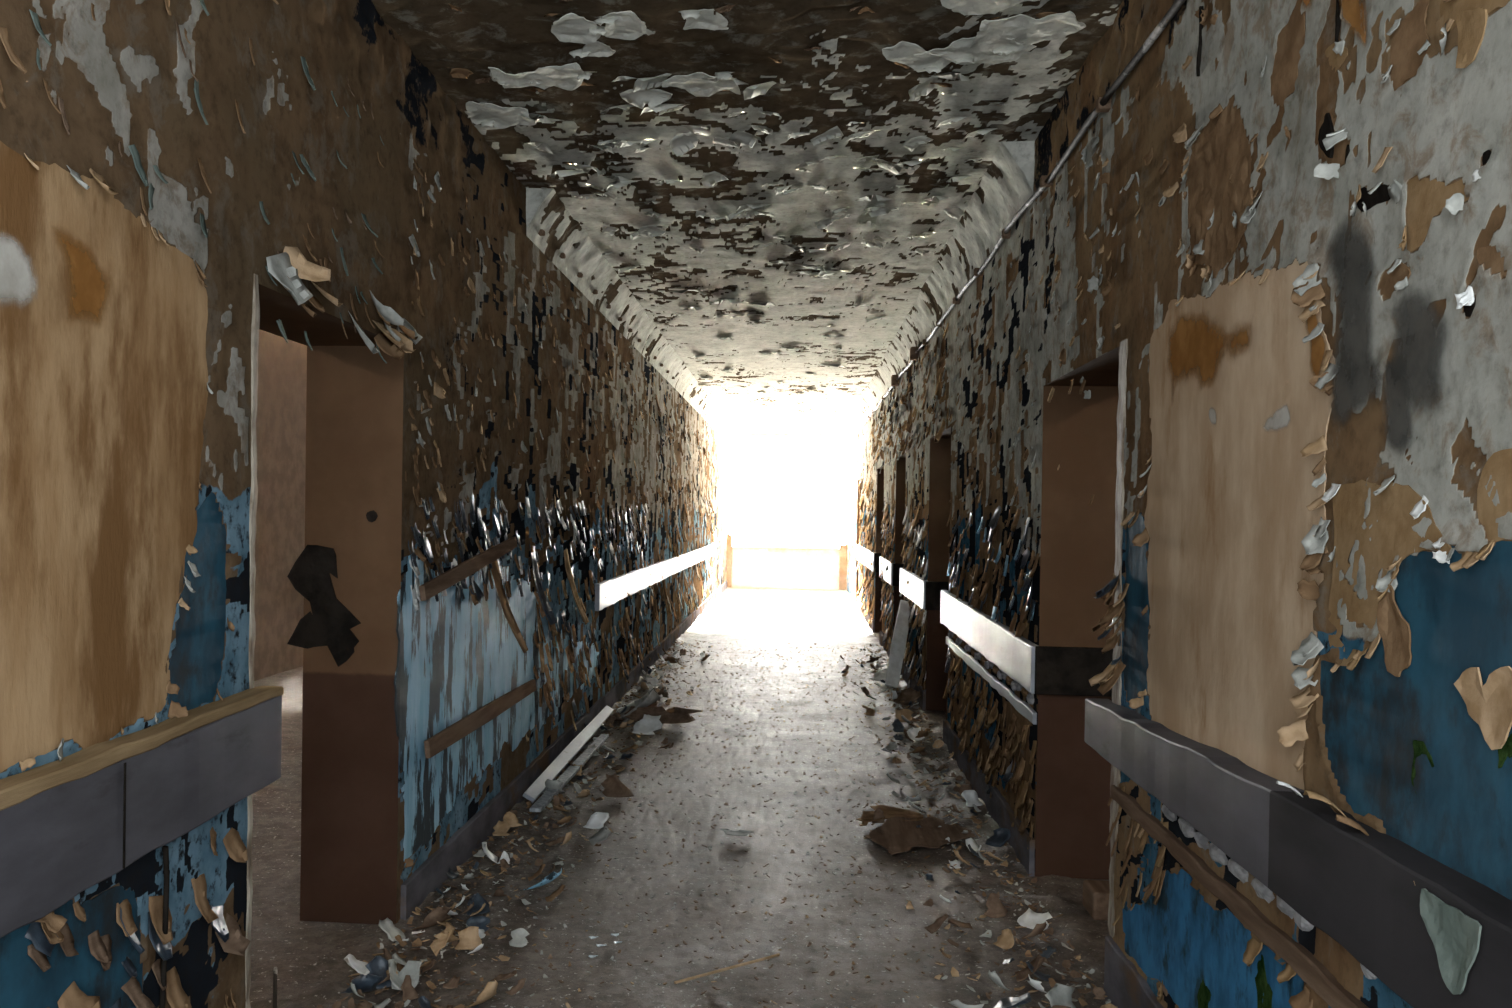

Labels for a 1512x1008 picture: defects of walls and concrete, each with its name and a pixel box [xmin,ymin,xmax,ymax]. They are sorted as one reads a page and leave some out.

peeling [0,9,71,135]
peeling [882,0,1086,101]
peeling [1260,0,1305,107]
peeling [450,0,997,279]
peeling [693,355,782,393]
peeling [796,326,847,394]
peeling [0,141,235,773]
peeling [265,158,716,868]
peeling [856,96,1512,901]
peeling [191,874,251,956]
peeling [210,827,248,863]
peeling [1105,786,1313,1008]